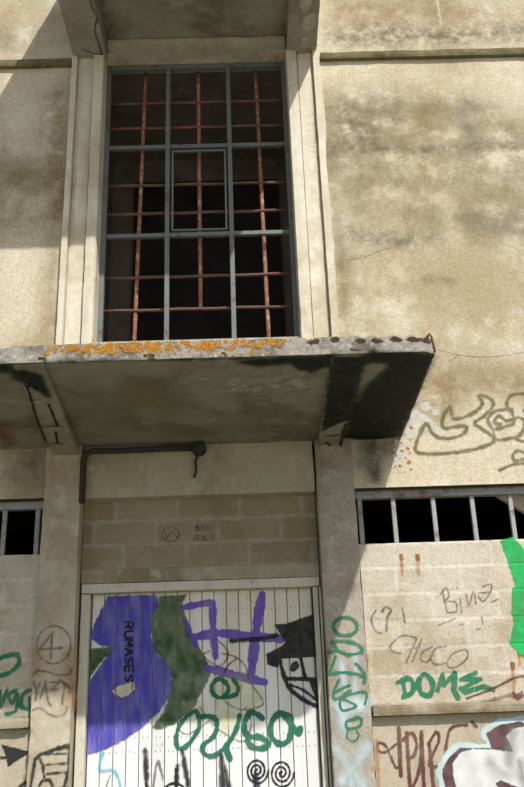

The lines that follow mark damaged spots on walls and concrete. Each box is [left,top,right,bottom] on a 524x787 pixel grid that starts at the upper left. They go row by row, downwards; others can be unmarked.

crack [82,0,102,55]
leakage [0,364,50,398]